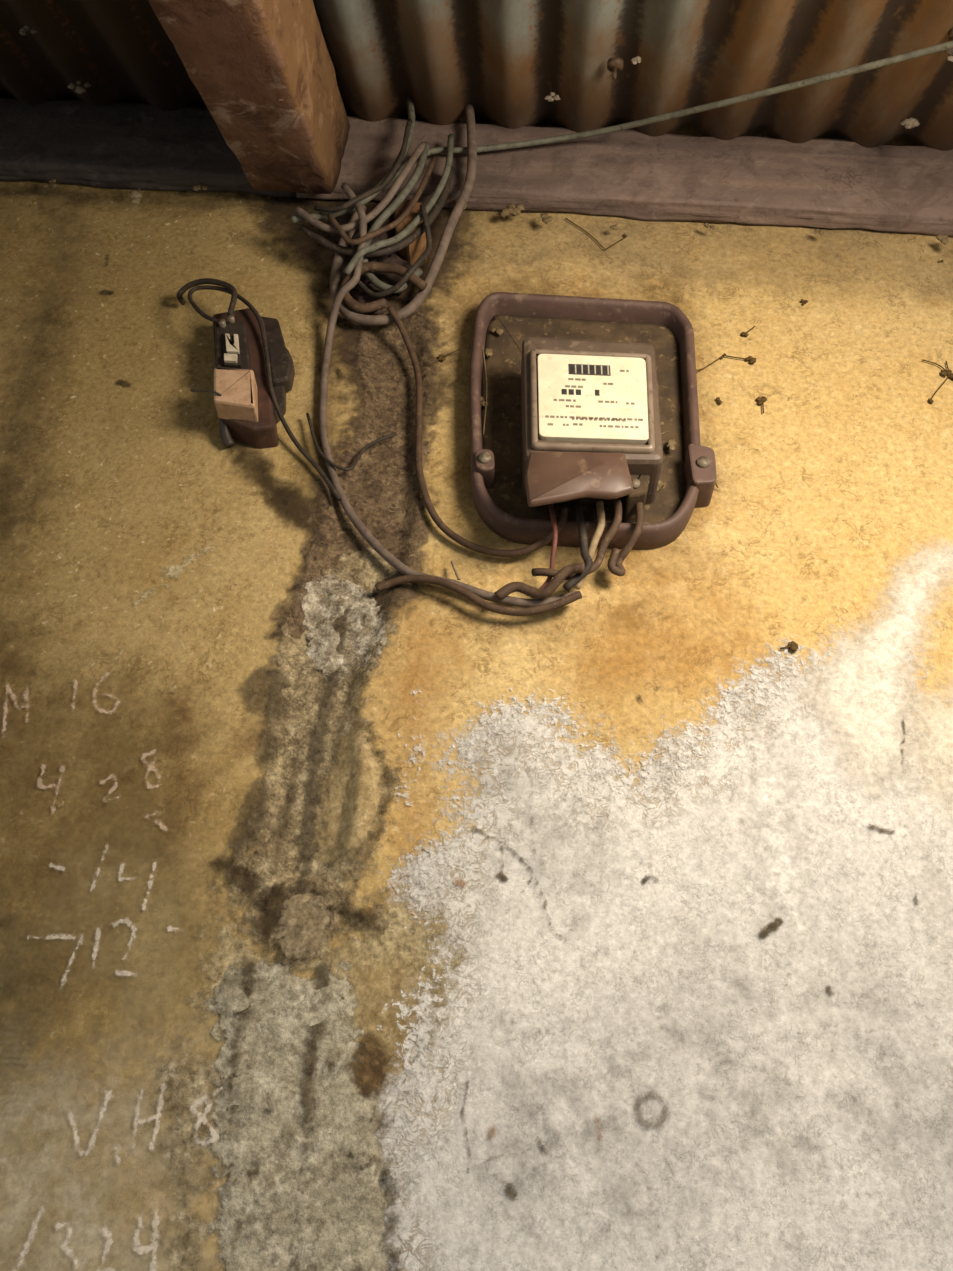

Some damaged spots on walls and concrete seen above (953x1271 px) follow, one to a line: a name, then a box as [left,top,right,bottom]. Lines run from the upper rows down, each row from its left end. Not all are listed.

water stain [635,1092,669,1128]